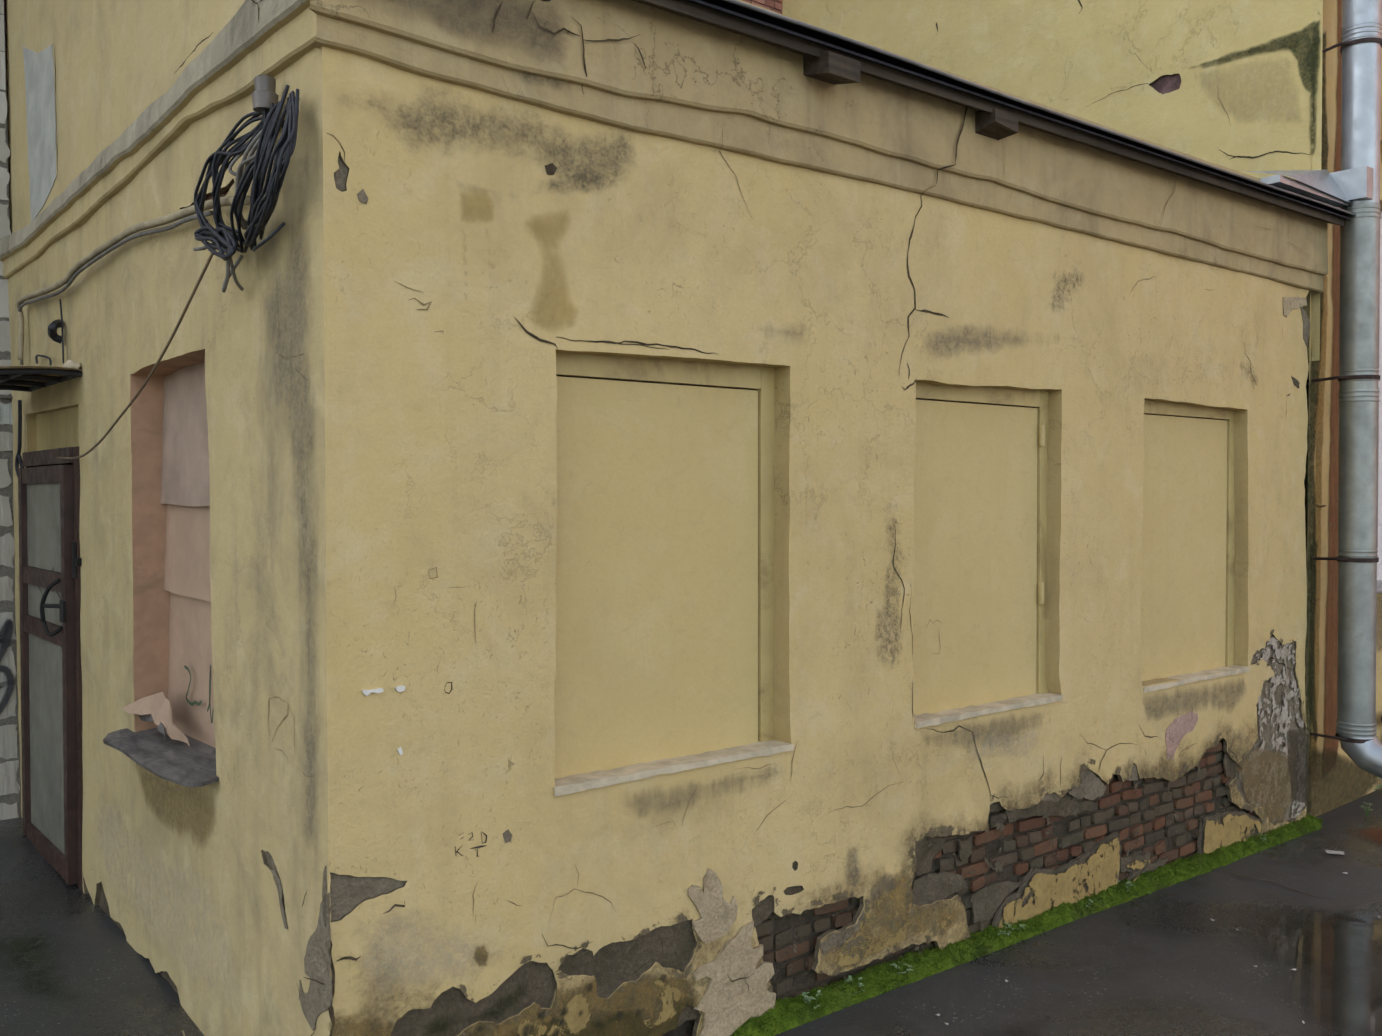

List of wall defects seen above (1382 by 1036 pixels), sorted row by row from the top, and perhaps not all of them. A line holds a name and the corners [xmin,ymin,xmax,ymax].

crack [492,0,646,94]
flaking render [1151,74,1181,94]
crack [899,107,968,390]
crack [515,318,717,354]
crack [893,528,1009,800]
flaking render [908,629,1309,939]
crack [1039,725,1196,788]
peeling [264,851,288,930]
peeling [296,866,405,1036]
peeling [391,913,702,1036]
flaking render [752,861,944,1000]